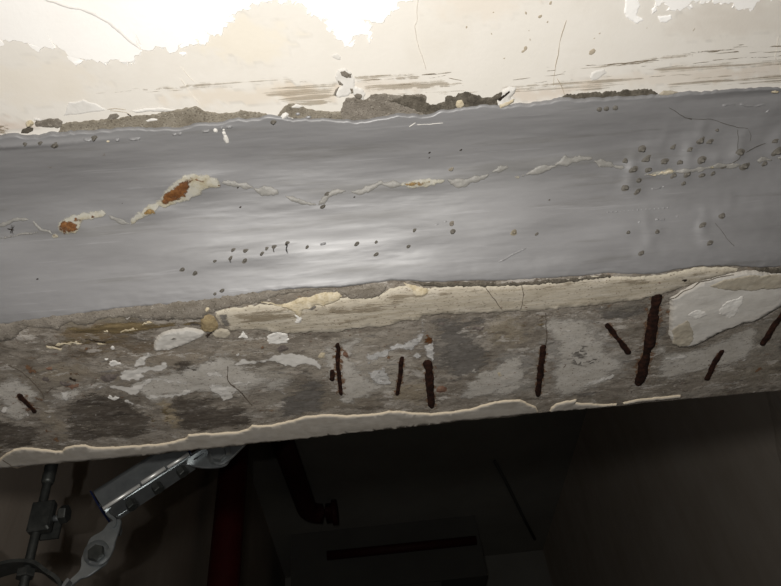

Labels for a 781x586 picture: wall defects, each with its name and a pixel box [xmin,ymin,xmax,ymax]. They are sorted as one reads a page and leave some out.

crack [46,0,140,49]
peeling [0,0,516,120]
spalling [59,100,267,132]
spalling [562,89,677,99]
rust [131,174,220,224]
rust [52,210,105,238]
spalling [0,285,387,341]
peeling [235,332,350,396]
spalling [605,294,664,386]
leakage [0,421,41,453]
leakage [67,393,153,441]
leakage [161,397,251,432]